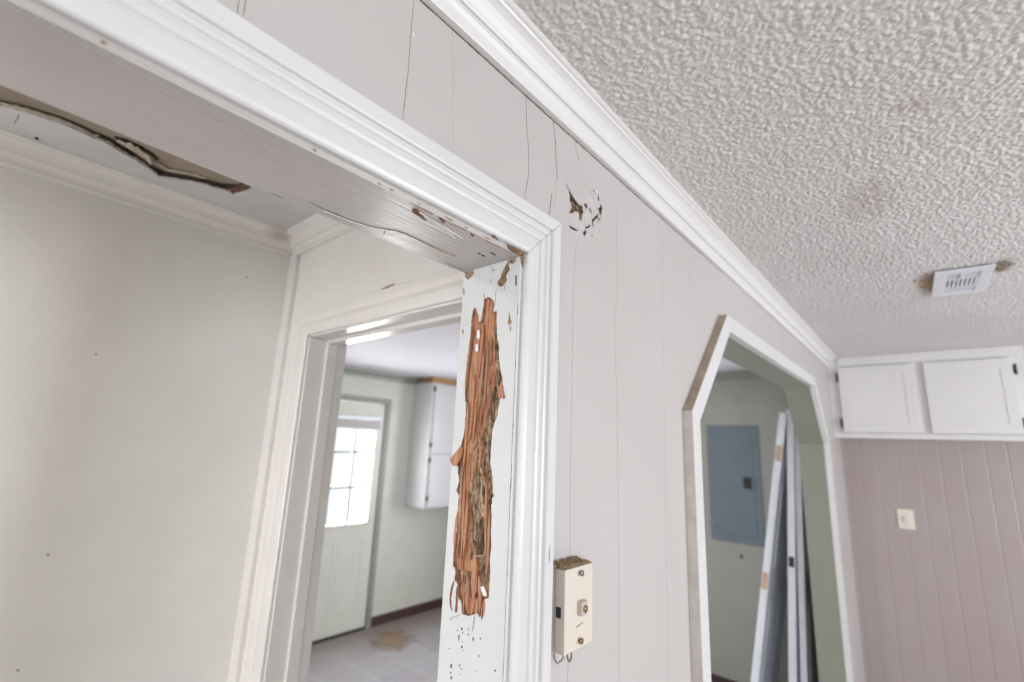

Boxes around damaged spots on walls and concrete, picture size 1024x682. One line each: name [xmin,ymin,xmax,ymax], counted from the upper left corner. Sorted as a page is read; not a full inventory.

peeling [411,203,499,257]
spalling [566,183,601,236]